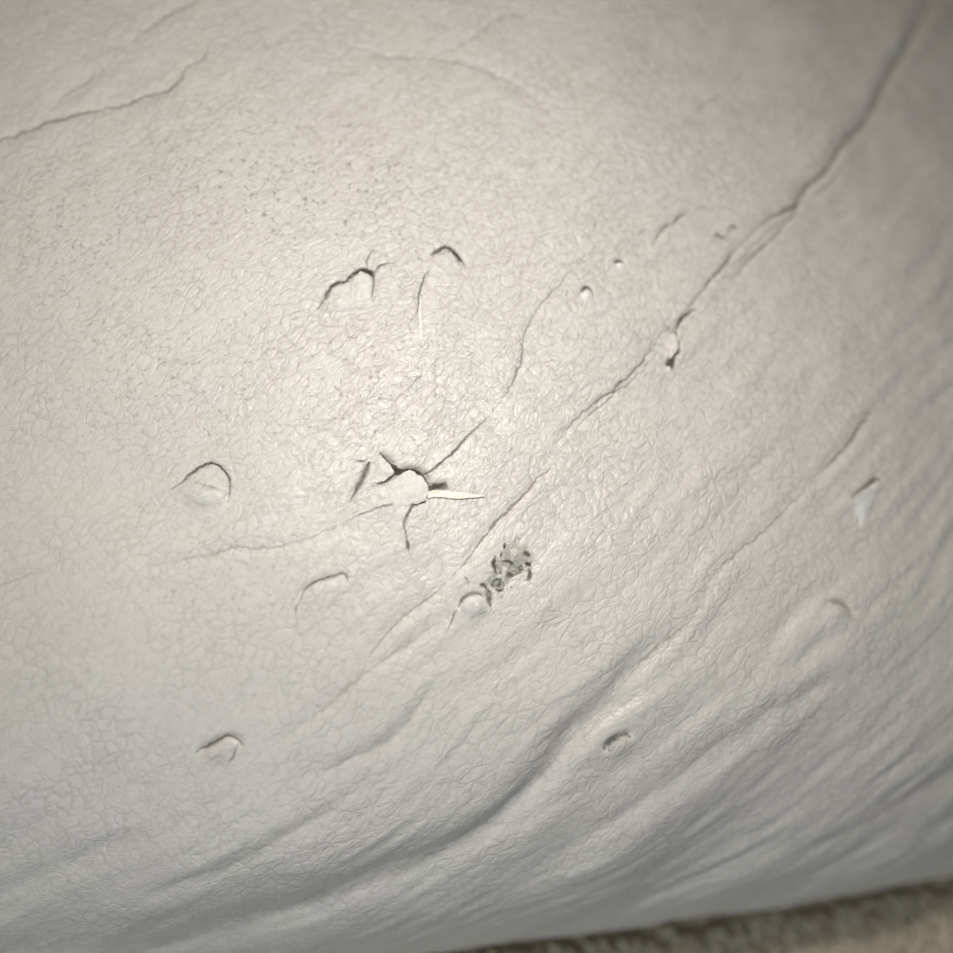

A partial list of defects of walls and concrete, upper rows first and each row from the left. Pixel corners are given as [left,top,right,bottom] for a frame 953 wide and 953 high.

peeling [502,566,528,580]